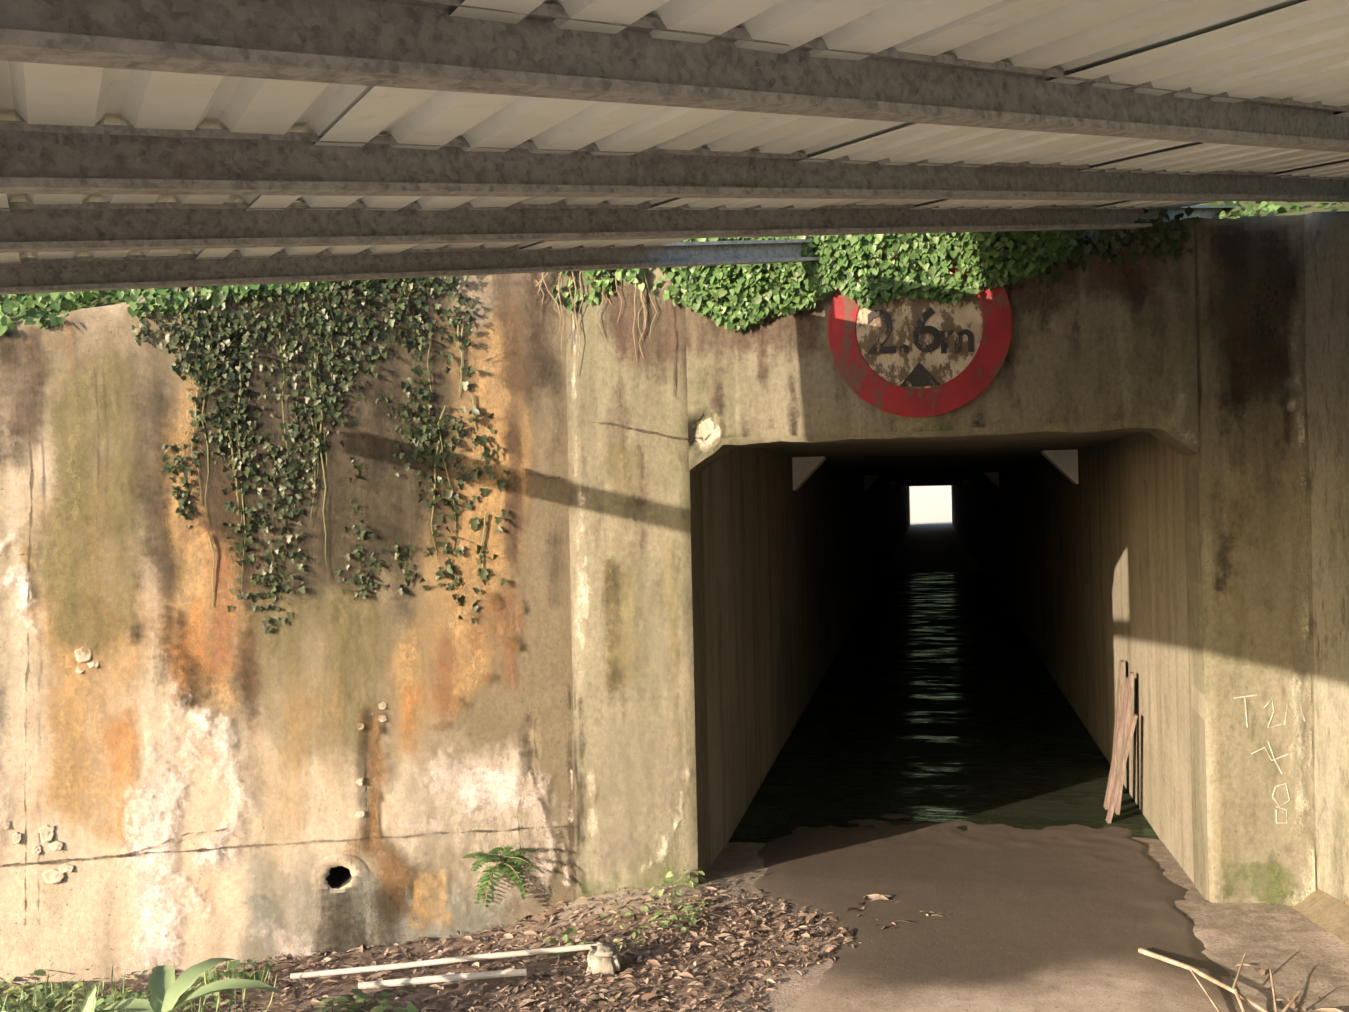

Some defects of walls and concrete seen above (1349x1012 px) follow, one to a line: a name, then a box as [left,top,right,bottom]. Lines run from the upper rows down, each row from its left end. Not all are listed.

damp [3,569,34,630]
damp [1,331,44,462]
rust [43,483,142,843]
damp [108,384,248,870]
rust [159,362,257,710]
rust [395,310,530,742]
damp [504,420,520,561]
damp [493,273,556,394]
damp [1210,225,1306,491]
damp [124,766,201,972]
damp [241,748,555,958]
damp [1293,849,1316,905]